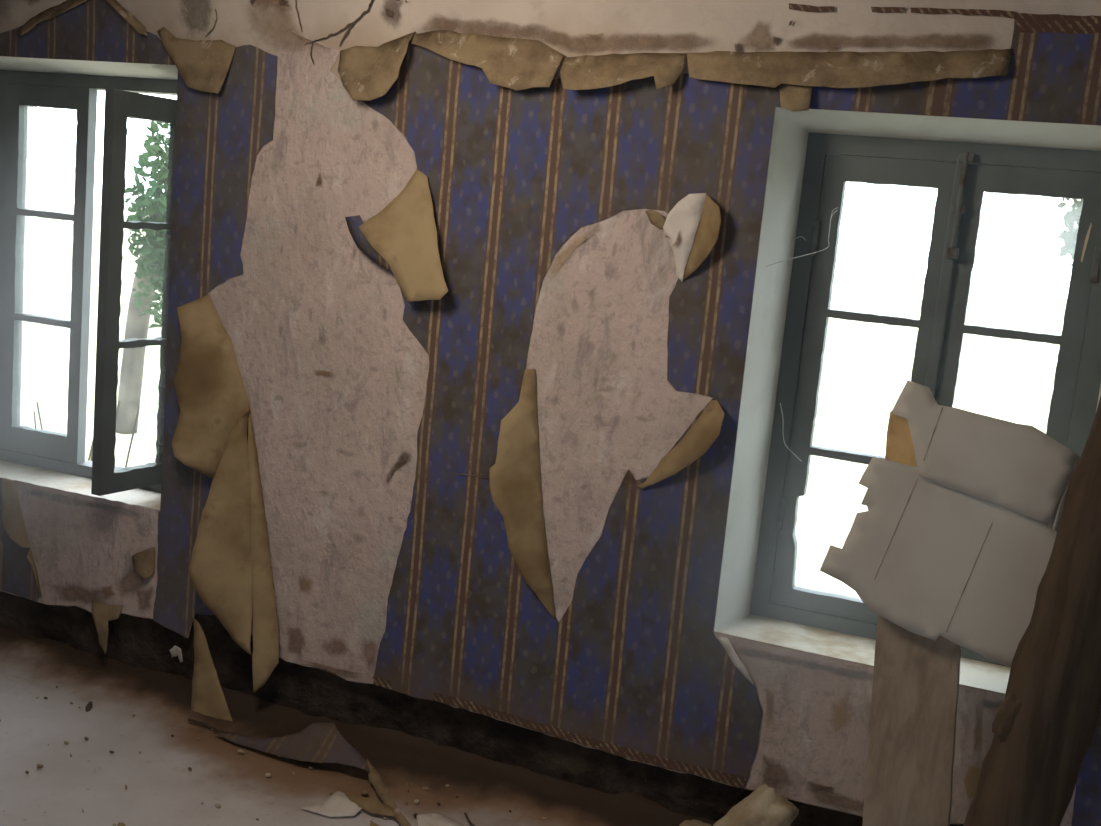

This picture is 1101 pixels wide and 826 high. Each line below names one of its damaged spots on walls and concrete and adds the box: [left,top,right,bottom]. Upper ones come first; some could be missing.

crack [295,0,400,64]
peeling [0,0,874,826]
peeling [950,685,1005,826]
peeling [1060,785,1076,826]